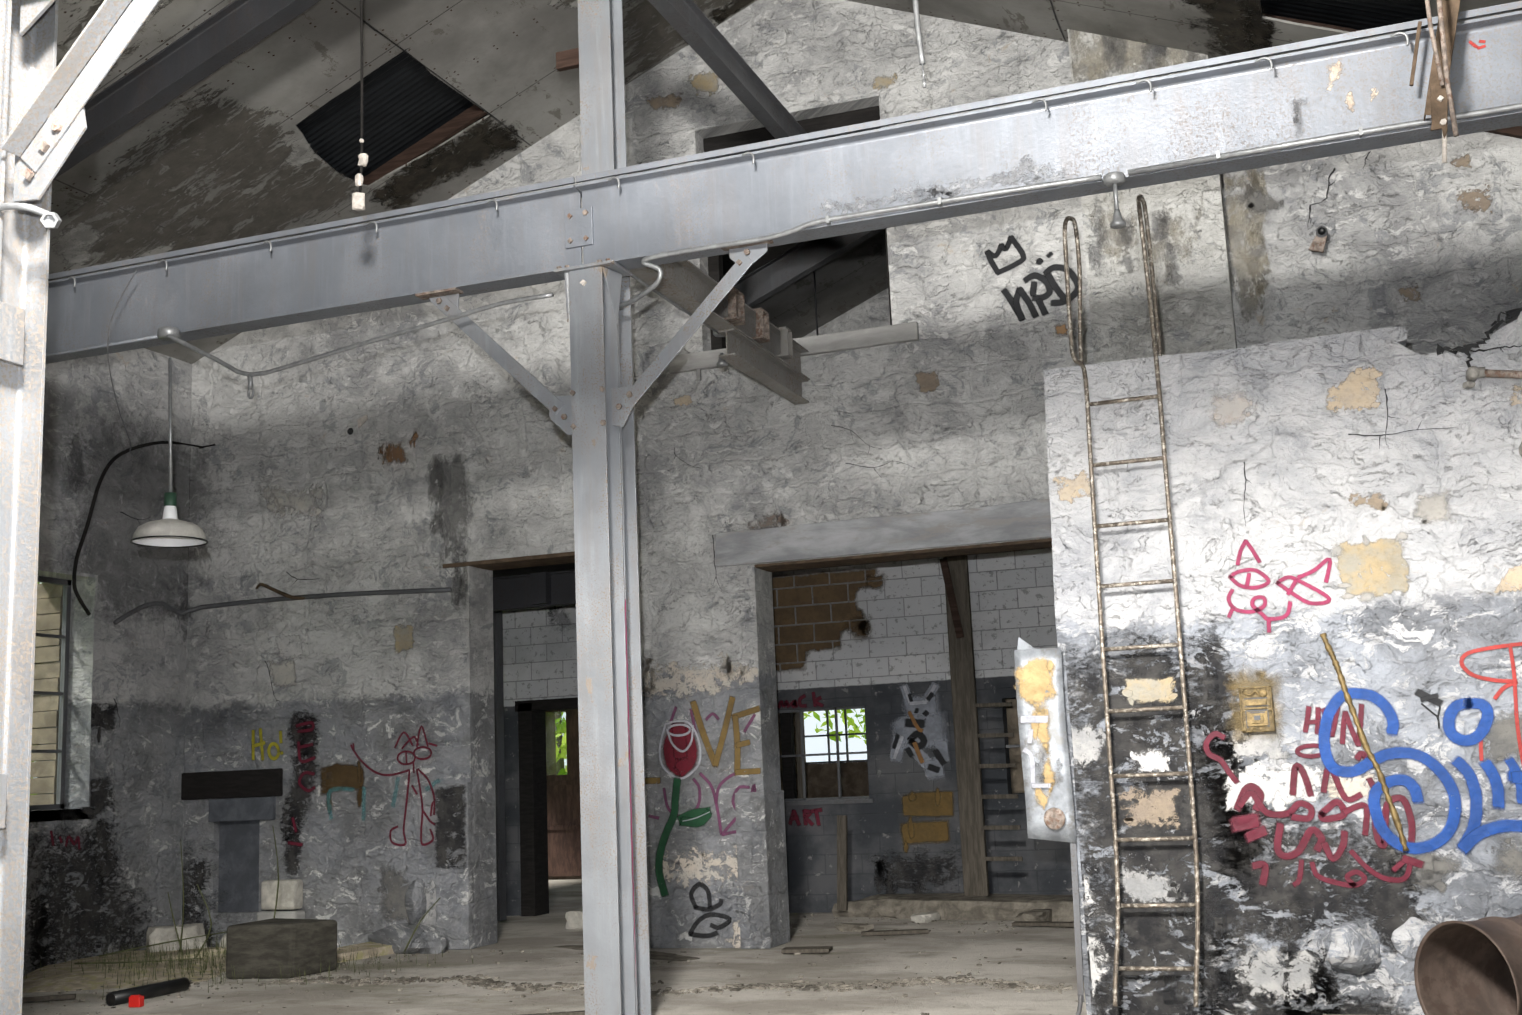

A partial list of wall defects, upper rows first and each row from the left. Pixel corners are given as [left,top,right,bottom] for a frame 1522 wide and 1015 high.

leakage [1183,0,1275,62]
crack [1437,311,1521,368]
spalling [1326,367,1383,413]
leakage [429,455,470,605]
spalling [1349,493,1388,511]
spalling [1332,532,1410,601]
spalling [1494,564,1522,593]